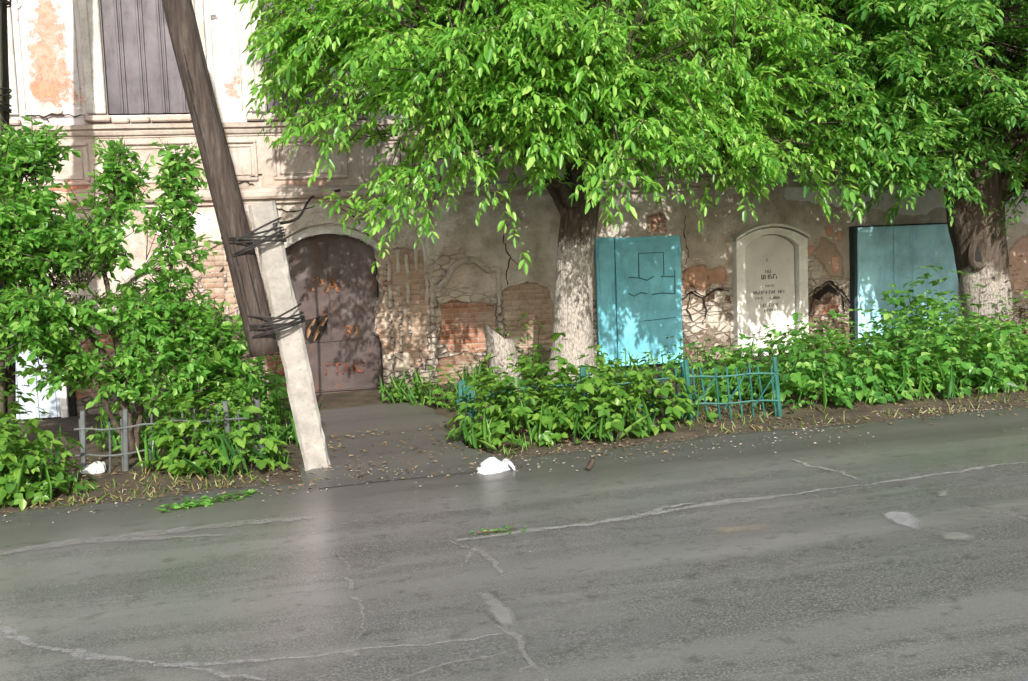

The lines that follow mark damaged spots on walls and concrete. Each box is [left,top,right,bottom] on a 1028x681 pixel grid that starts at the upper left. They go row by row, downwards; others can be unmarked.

peeling [15,0,85,109]
flaking render [644,210,670,235]
crack [503,224,518,285]
flaking render [374,245,554,385]
flaking render [682,287,731,308]
flaking render [808,257,850,349]
flaking render [682,317,733,361]
crack [865,462,1027,486]
crack [627,503,693,518]
crack [86,534,224,543]
crack [352,633,504,650]
crack [171,661,266,681]